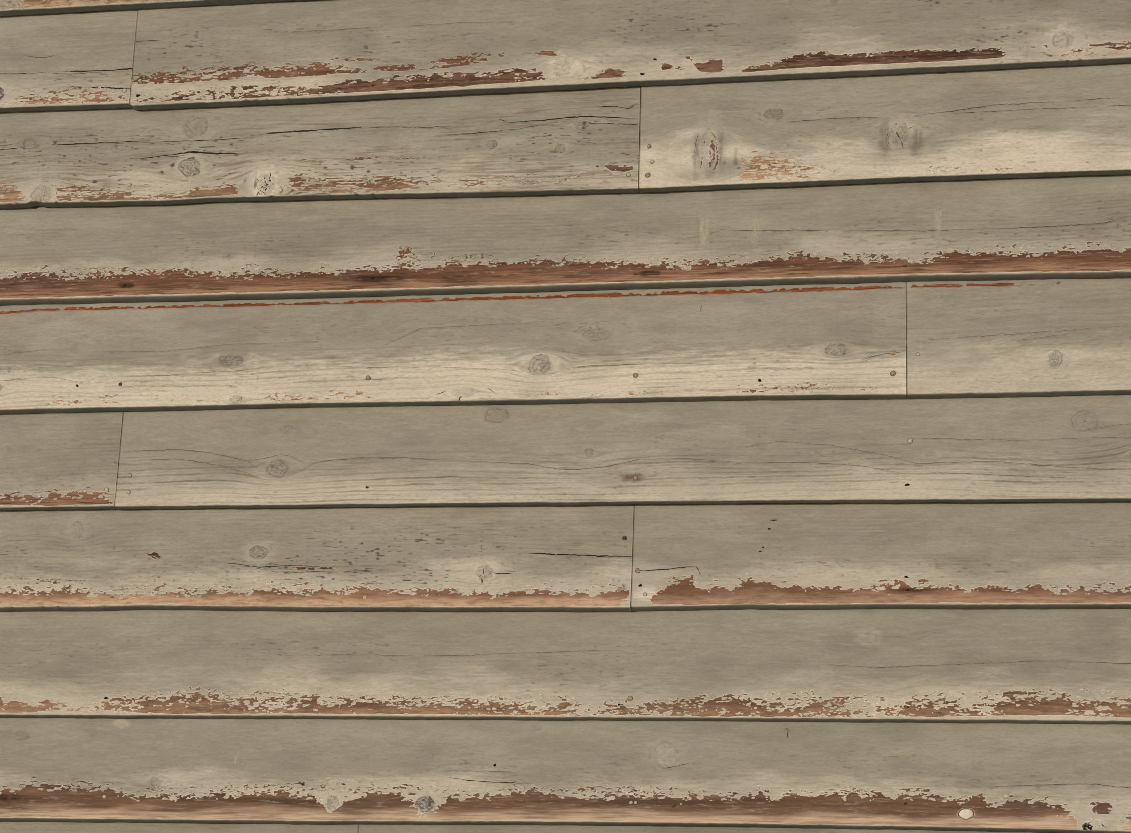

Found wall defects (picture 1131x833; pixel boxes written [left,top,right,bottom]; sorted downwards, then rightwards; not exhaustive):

peeling [6,0,179,9]
peeling [4,49,558,105]
peeling [740,47,1006,73]
peeling [54,182,239,202]
peeling [283,155,580,195]
peeling [0,239,1131,315]
peeling [0,486,114,507]
peeling [0,565,630,607]
peeling [649,573,1131,605]
peeling [0,685,1131,719]
peeling [0,776,1079,829]
peeling [1089,801,1131,831]